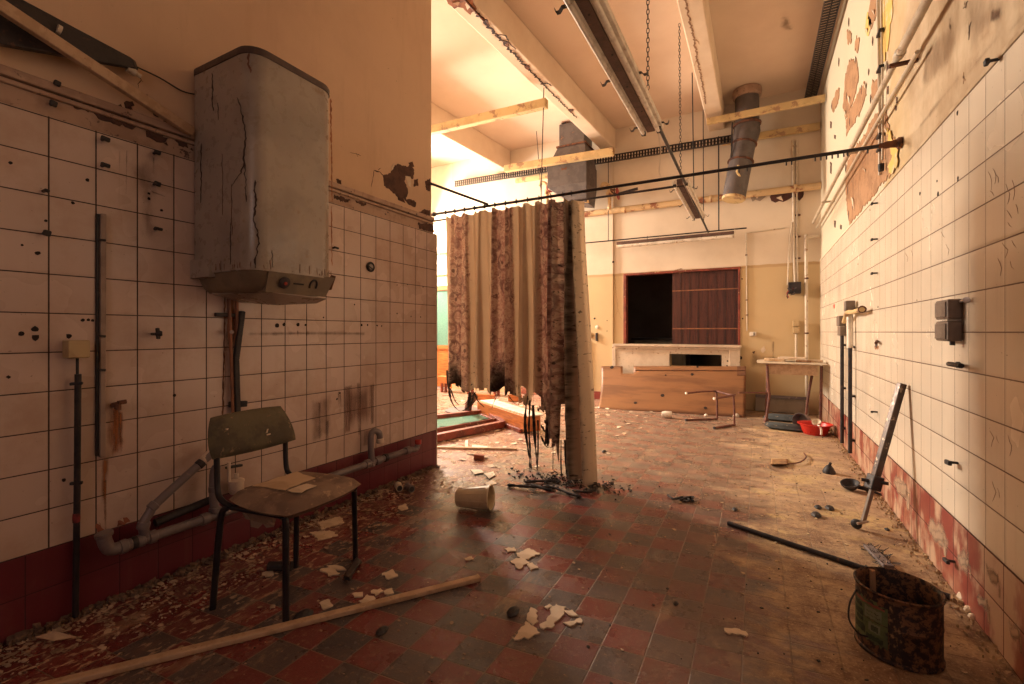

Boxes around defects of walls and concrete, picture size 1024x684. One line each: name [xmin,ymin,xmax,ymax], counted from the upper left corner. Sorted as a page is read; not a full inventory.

peeling [830,0,898,229]
peeling [383,162,434,232]
corrosion [102,410,122,515]
peeling [928,520,971,579]